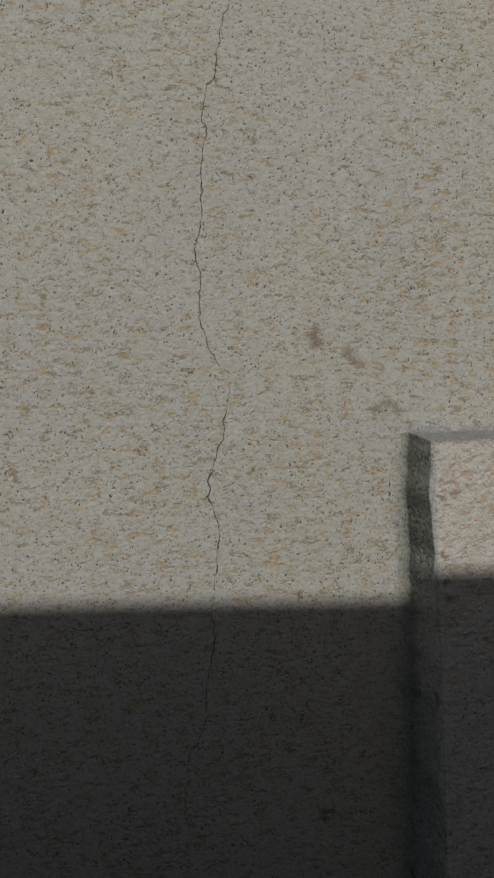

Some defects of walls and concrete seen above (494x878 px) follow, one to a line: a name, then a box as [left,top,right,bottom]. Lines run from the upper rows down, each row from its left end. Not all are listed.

crack [183,2,231,814]